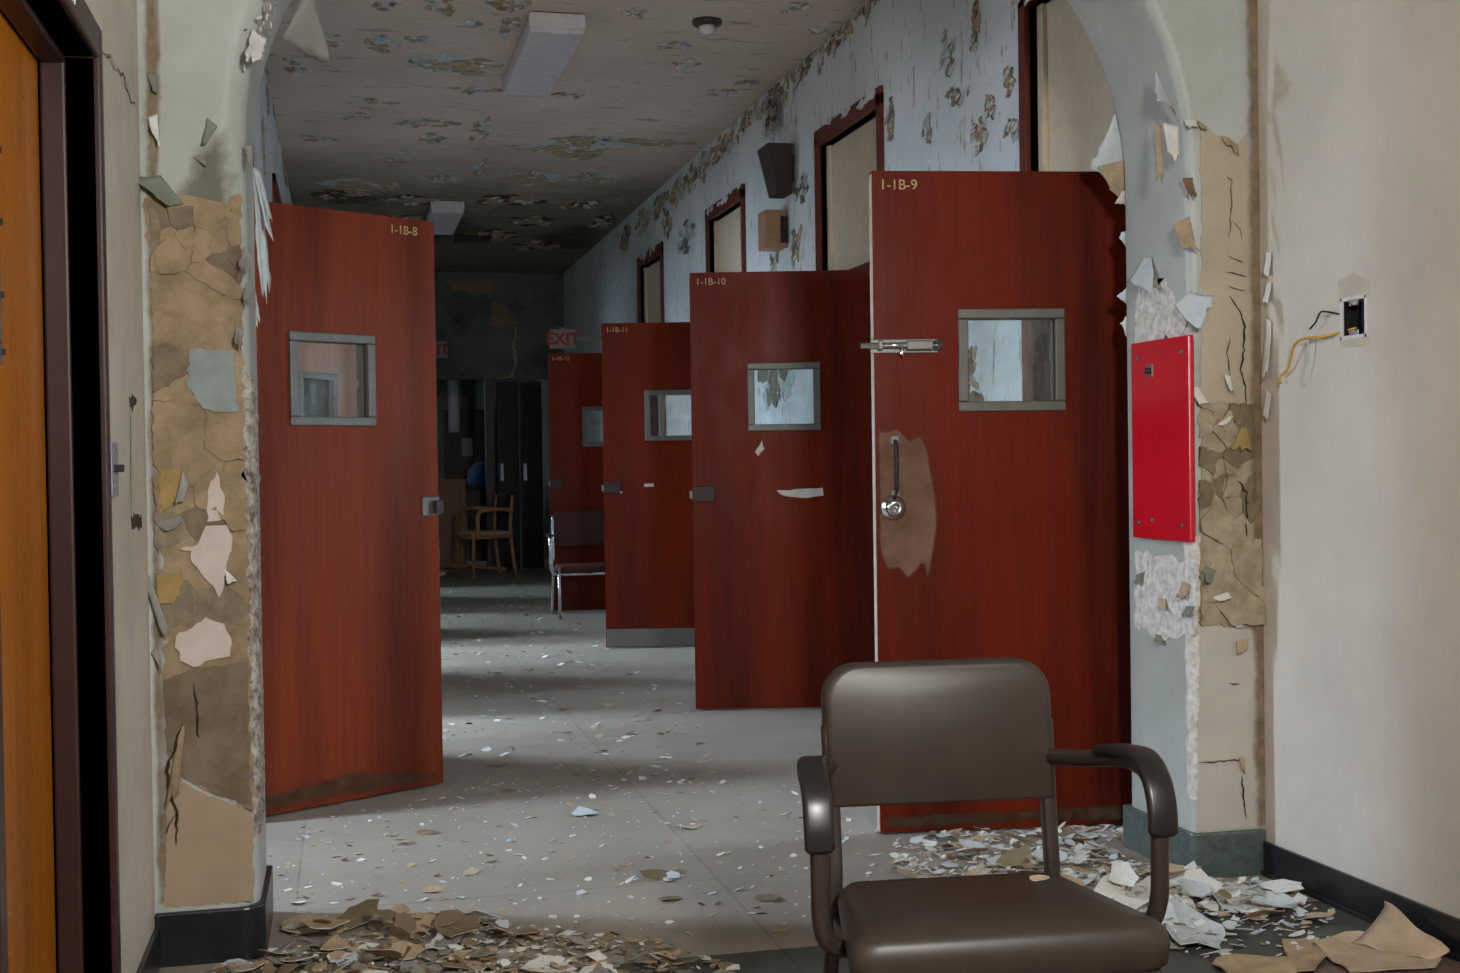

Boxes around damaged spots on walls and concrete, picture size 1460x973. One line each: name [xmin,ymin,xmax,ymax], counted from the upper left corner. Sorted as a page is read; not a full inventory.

crack [103,52,137,108]
peeling [261,57,307,188]
peeling [309,0,880,261]
peeling [826,89,895,142]
peeling [770,224,803,271]
peeling [1134,120,1255,404]
peeling [129,193,266,837]
crack [1199,757,1247,819]